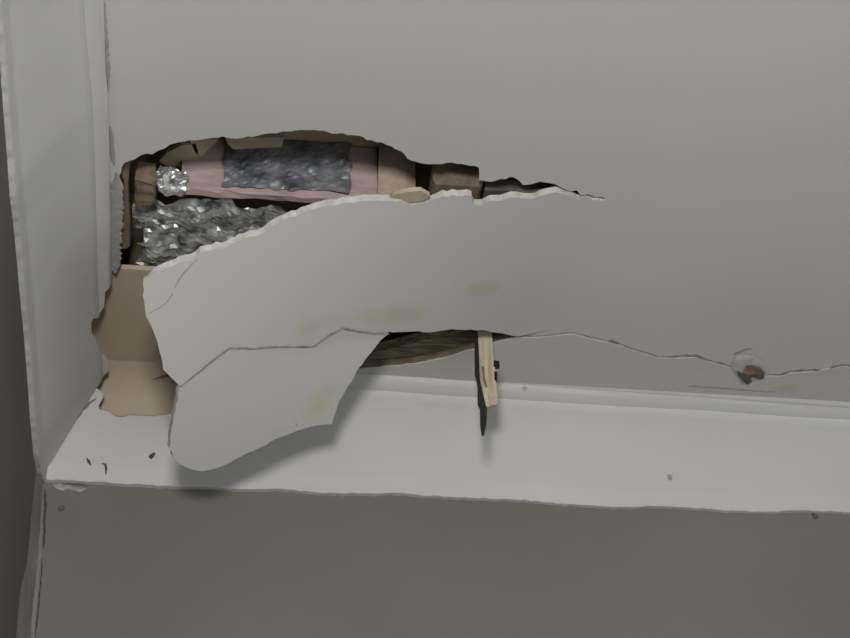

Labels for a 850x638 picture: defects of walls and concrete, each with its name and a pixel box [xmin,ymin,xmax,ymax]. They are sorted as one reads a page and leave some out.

spalling [143,186,607,471]
crack [519,332,731,367]
crack [690,364,850,392]